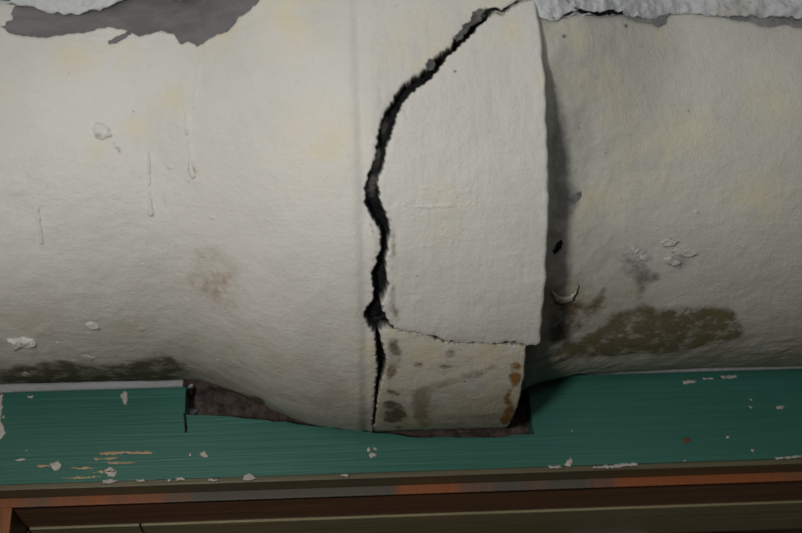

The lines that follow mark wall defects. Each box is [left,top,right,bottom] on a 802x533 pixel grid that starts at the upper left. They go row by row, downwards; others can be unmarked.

peeling [1,0,259,47]
crack [553,0,623,18]
crack [366,0,521,388]
leakage [550,300,741,361]
leakage [0,358,183,383]
rust [499,363,520,425]
peeling [683,374,738,384]
peeling [37,450,153,484]